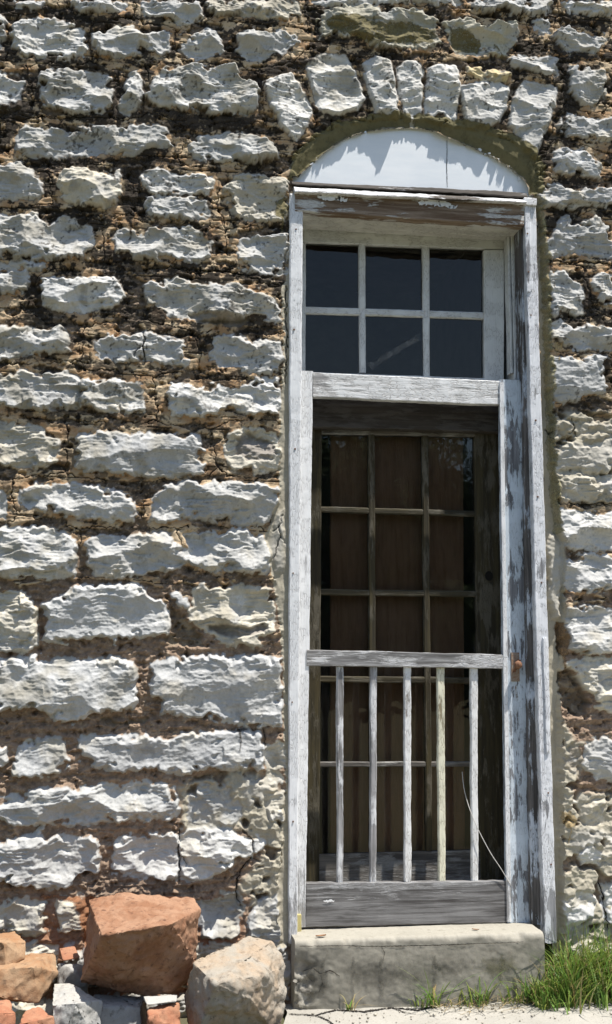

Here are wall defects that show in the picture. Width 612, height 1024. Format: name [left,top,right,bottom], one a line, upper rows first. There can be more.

peeling [317,195,348,204]
peeling [418,200,457,209]
crack [229,829,258,905]